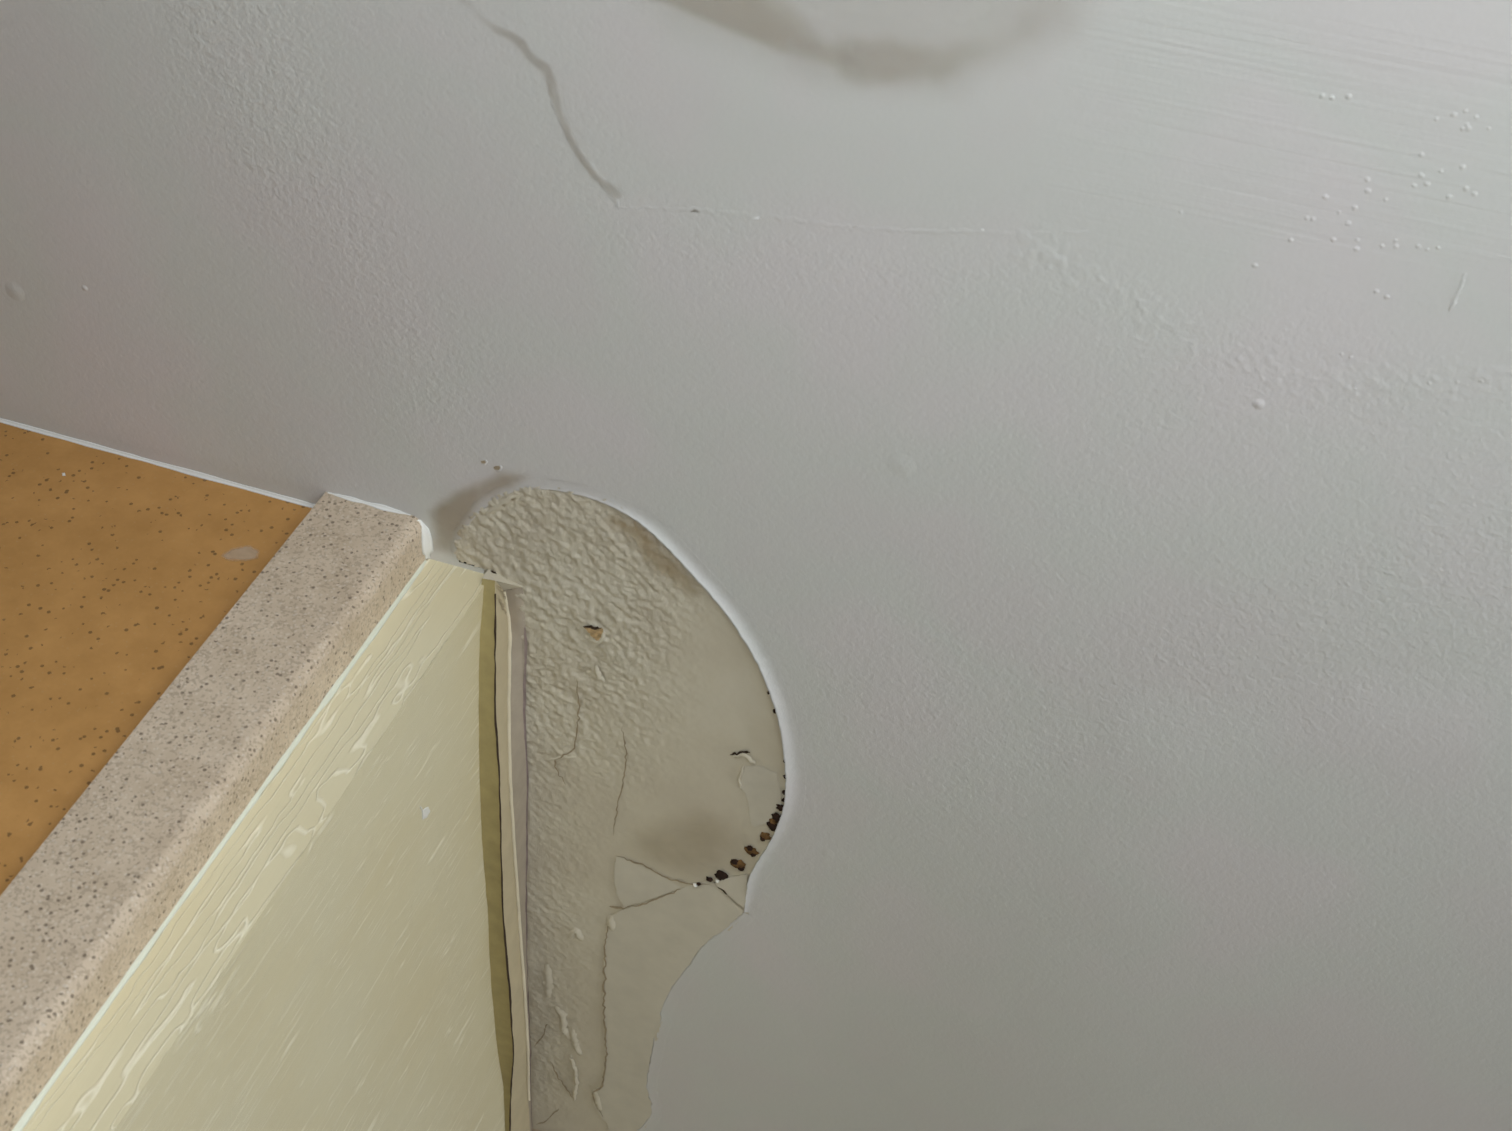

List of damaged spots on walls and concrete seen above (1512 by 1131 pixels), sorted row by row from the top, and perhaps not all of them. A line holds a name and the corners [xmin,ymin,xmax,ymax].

peeling [450,460,806,1131]